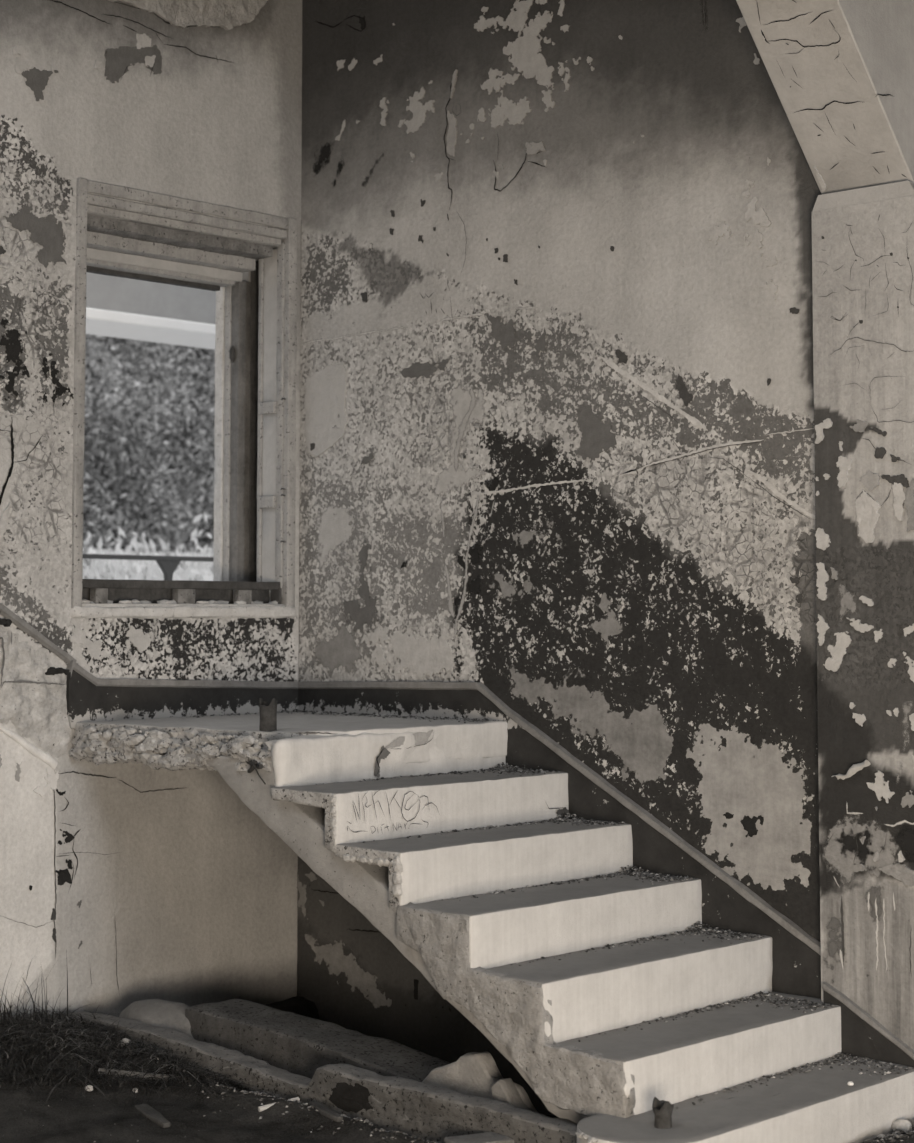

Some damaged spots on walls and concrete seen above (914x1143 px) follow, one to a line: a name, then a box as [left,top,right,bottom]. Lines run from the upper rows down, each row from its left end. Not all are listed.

crack [51,0,234,63]
peeling [460,0,595,146]
crack [766,0,907,178]
crack [444,56,466,270]
peeling [0,319,74,406]
crack [819,215,914,423]
crack [0,424,43,505]
peeling [815,418,914,543]
peeling [790,528,883,672]
spalling [0,611,272,782]
peeling [867,701,914,811]
crack [576,1132,598,1143]